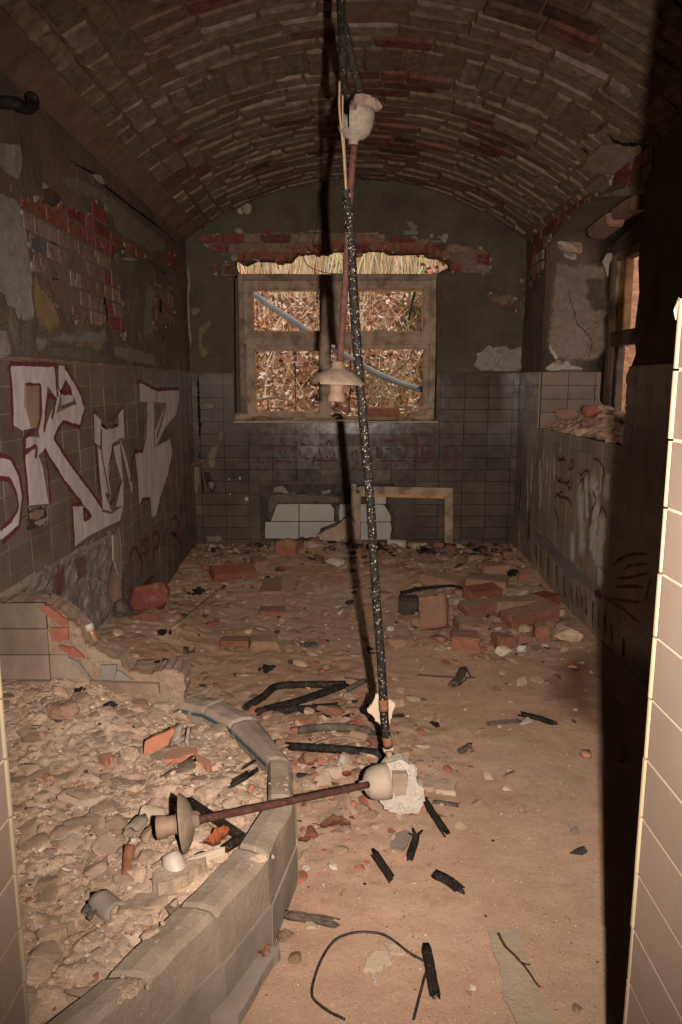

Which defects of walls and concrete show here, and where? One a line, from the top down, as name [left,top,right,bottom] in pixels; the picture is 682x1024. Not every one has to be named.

spalling [0,143,147,341]
crack [69,159,178,246]
spalling [198,228,492,280]
spalling [528,141,657,286]
spalling [152,283,175,330]
peeling [545,345,582,371]
spalling [0,528,133,695]